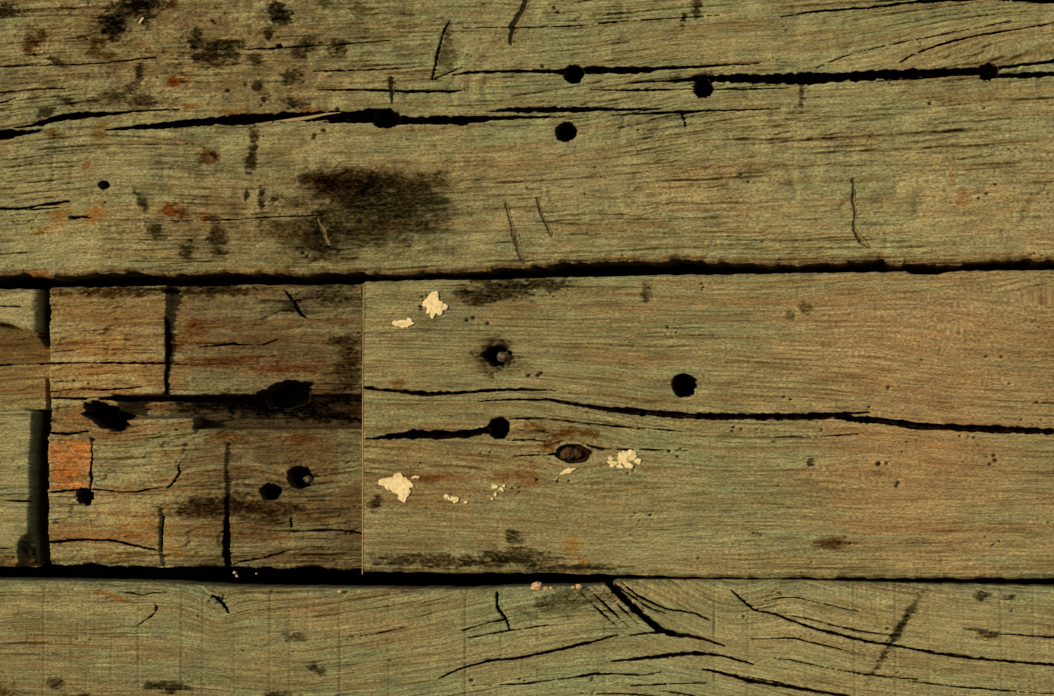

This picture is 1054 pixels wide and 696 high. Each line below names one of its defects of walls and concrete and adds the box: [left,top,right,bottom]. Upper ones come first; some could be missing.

crack [0,0,1054,140]
damp [270,167,449,261]
crack [0,339,279,405]
crack [304,386,1054,456]
peeling [384,476,419,503]
peeling [607,449,641,469]
crack [440,579,1054,696]